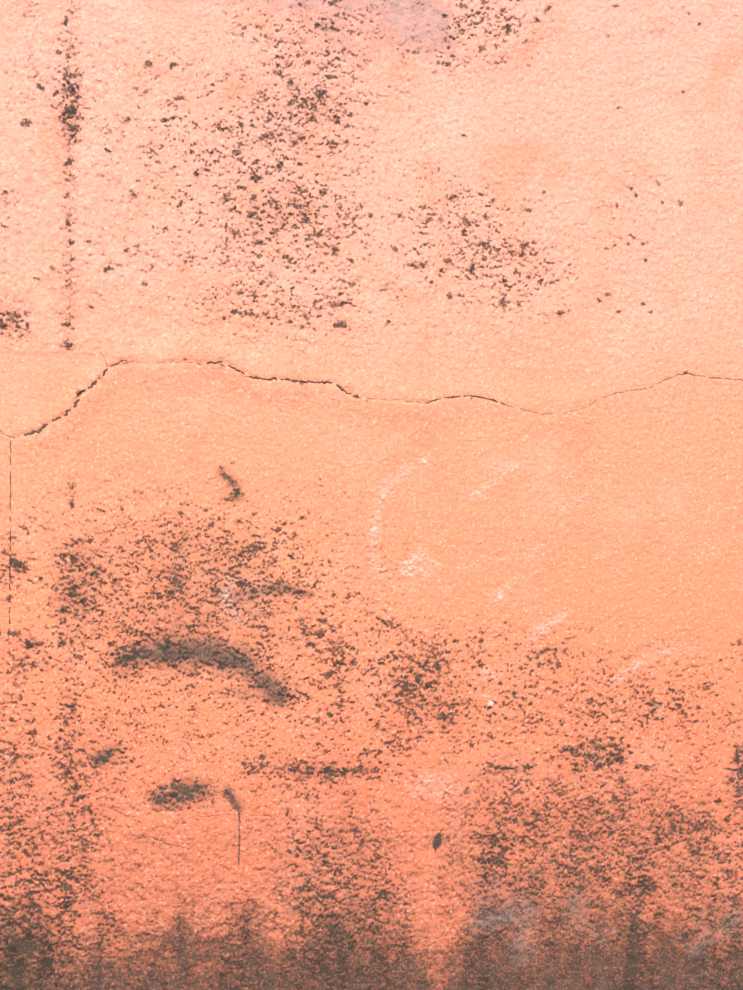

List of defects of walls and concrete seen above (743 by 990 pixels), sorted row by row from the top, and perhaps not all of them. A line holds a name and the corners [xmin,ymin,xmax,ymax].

crack [0,352,141,644]
water stain [176,0,527,335]
crack [175,358,743,415]
mould [390,190,570,310]
water stain [0,503,743,990]